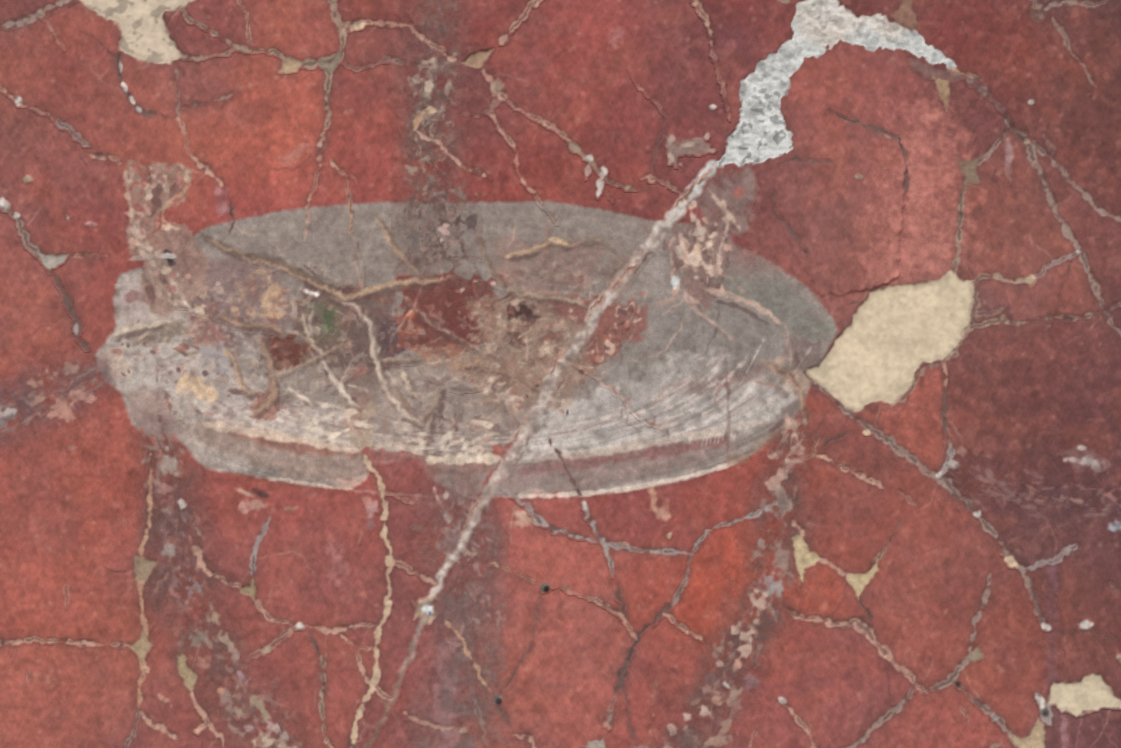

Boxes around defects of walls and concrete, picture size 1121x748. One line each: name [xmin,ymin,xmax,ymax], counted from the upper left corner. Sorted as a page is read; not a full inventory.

flaking render [77,0,197,66]
crack [889,0,919,33]
crack [1028,0,1110,89]
crack [0,196,115,352]
crack [0,82,127,166]
crack [826,108,912,195]
peeling [806,79,994,468]
crack [950,75,1121,340]
crack [114,0,780,748]
crack [0,451,226,748]
crack [776,361,1121,748]
flaking render [1046,672,1121,719]